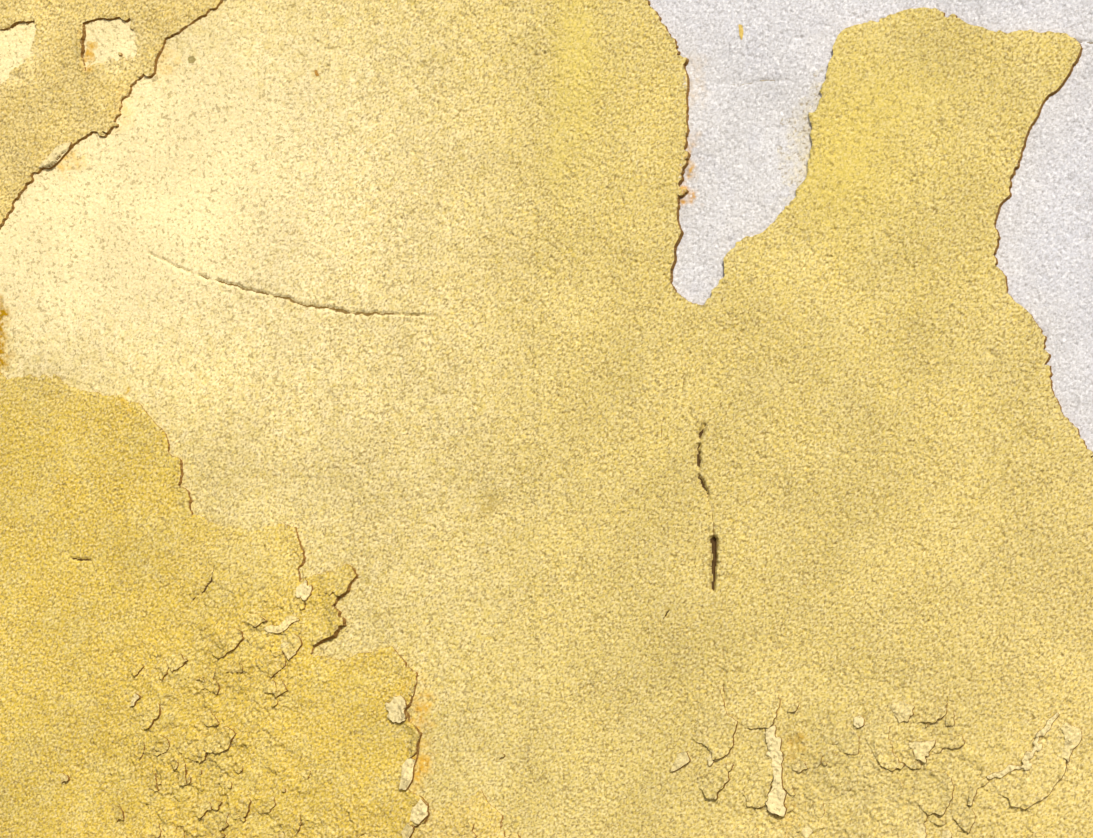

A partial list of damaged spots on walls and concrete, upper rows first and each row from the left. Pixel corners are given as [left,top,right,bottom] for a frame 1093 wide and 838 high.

crack [155,256,420,316]
flaking render [648,0,1093,458]
peeling [0,0,541,838]
crack [697,424,717,591]
peeling [692,688,1082,838]